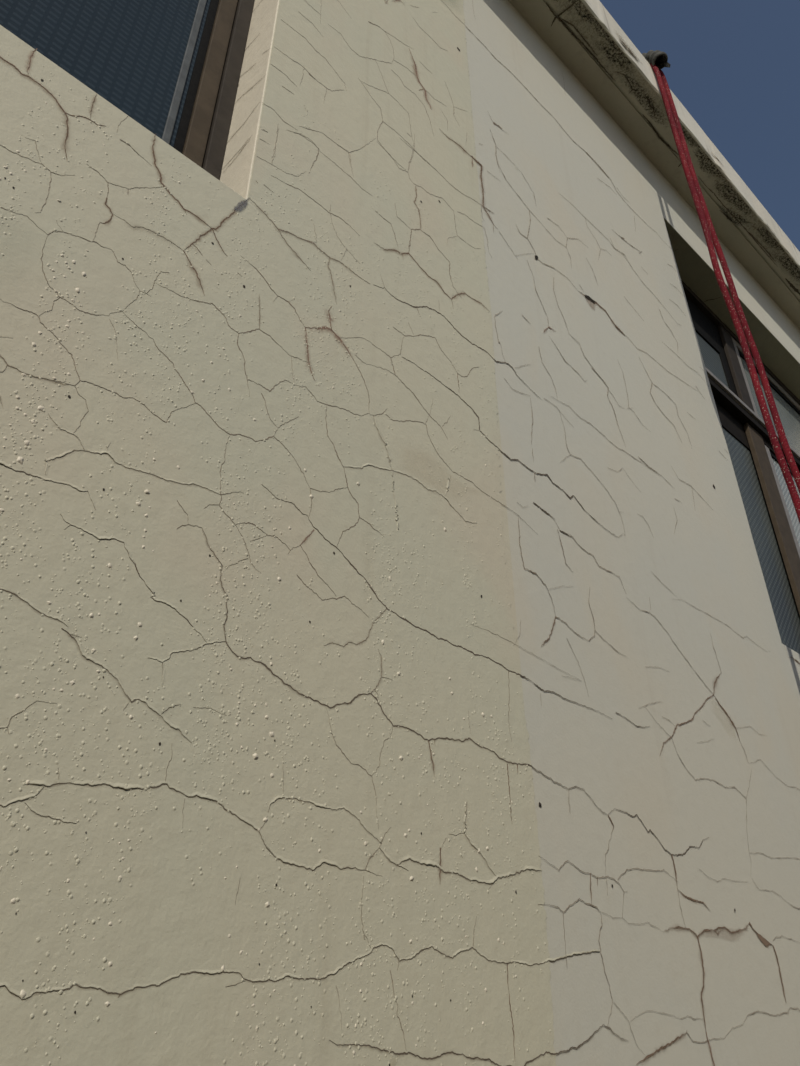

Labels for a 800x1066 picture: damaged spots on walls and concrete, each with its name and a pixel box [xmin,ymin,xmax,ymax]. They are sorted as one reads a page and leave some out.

crack [234,3,347,105]
damp [569,0,663,123]
damp [683,127,751,225]
damp [757,228,800,281]
crack [0,21,778,890]
crack [0,808,799,1066]